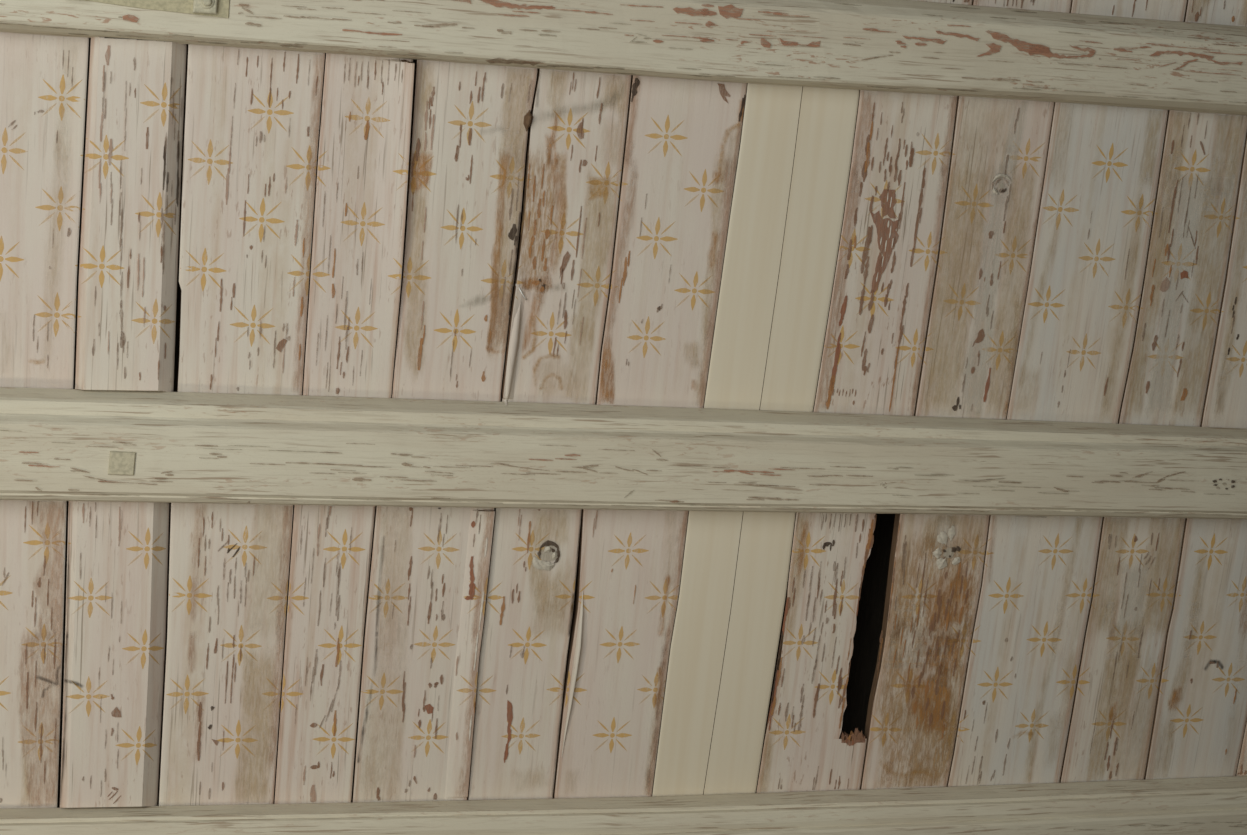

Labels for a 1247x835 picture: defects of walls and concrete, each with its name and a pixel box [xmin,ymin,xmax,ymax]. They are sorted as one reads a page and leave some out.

peeling [843,25,1247,83]
peeling [819,102,926,412]
water stain [882,540,975,784]